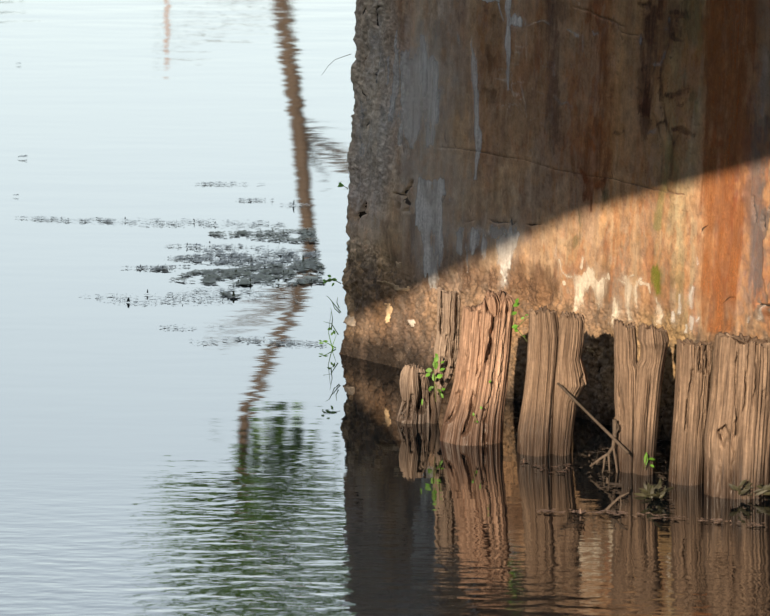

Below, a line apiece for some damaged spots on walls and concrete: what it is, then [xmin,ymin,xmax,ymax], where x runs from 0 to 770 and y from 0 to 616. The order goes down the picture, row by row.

efflorescence [388,31,438,148]
efflorescence [472,53,482,179]
leakage [411,177,445,288]
leakage [490,228,519,288]
leakage [549,259,610,311]
efflorescence [611,278,650,323]